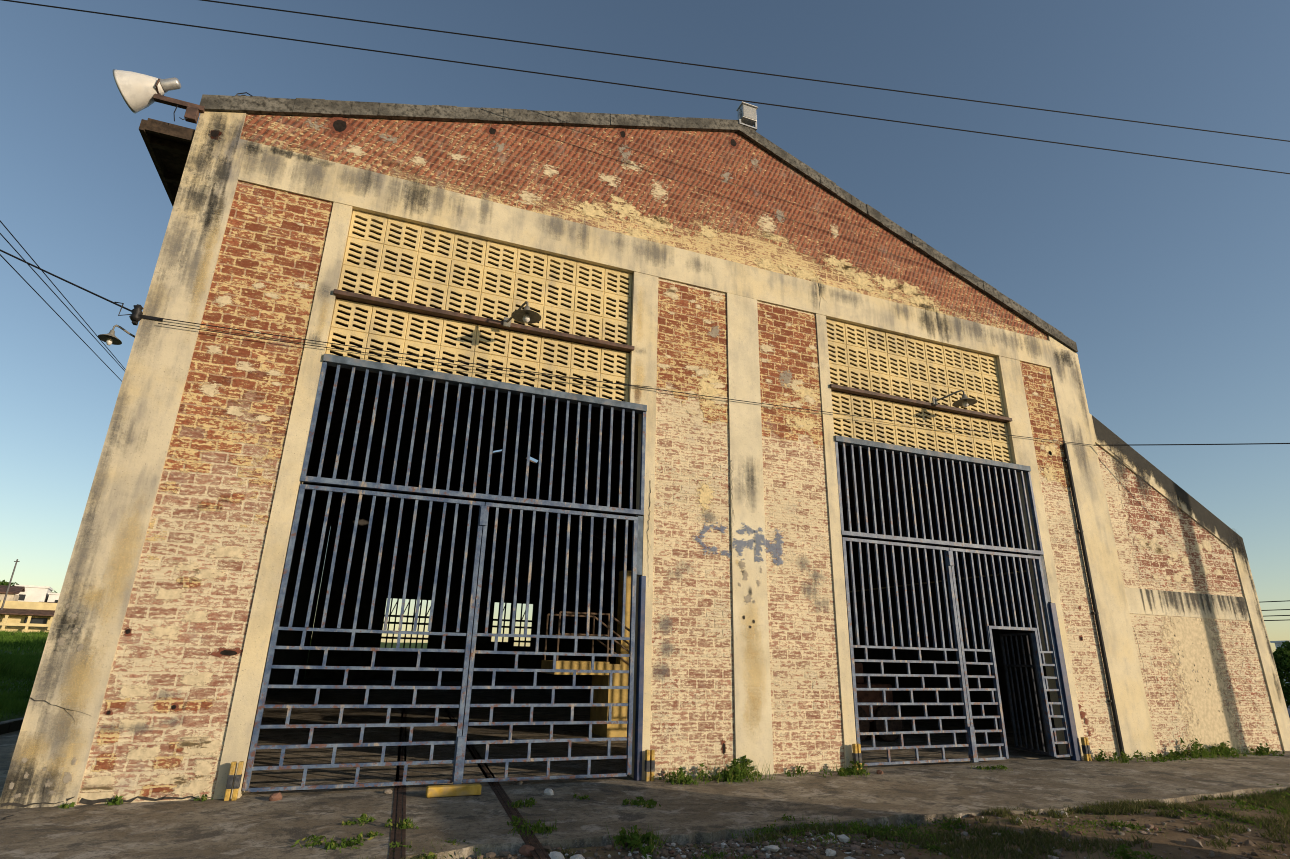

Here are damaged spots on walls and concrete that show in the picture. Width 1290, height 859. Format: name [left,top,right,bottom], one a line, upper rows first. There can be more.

water stain [179,115,327,236]
water stain [396,181,441,209]
peeling [241,115,1047,340]
water stain [1081,397,1280,691]
crack [30,697,88,723]